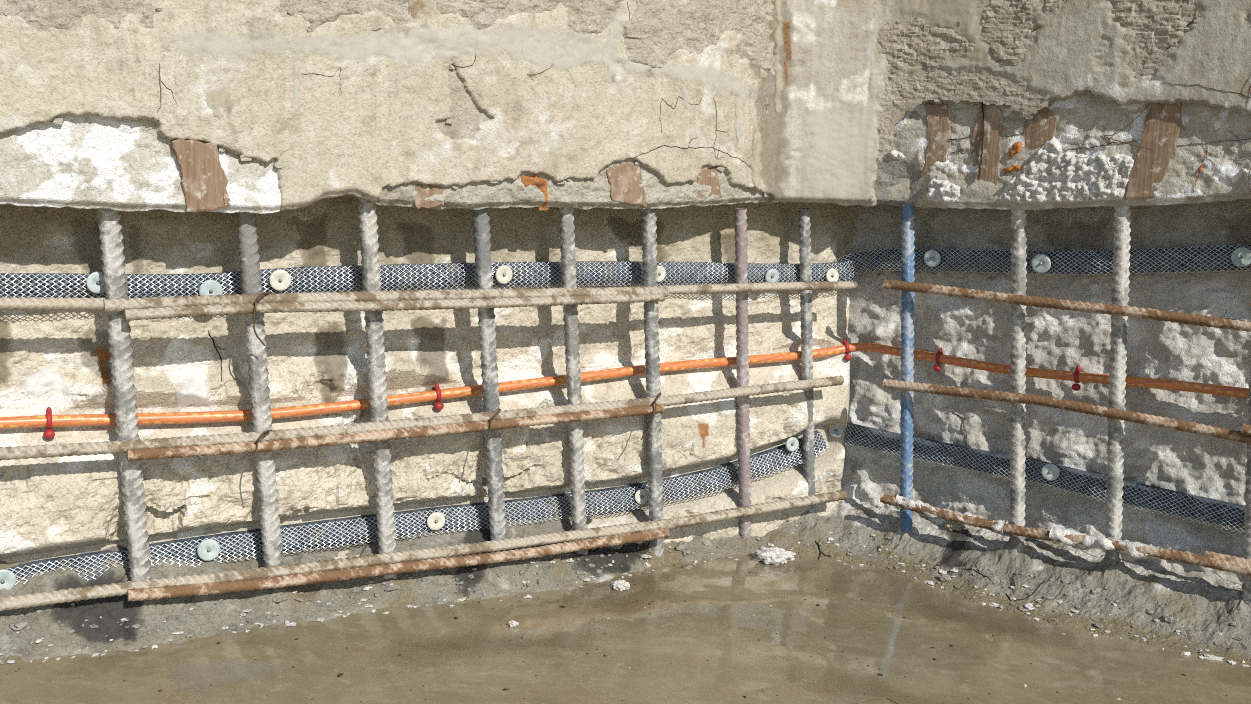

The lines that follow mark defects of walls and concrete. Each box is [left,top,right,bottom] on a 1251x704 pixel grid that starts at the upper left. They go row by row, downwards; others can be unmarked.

spalling [869,0,1251,210]
spalling [0,115,284,214]
corrosion [519,173,549,210]
spalling [371,158,770,210]
corrosion [96,348,111,385]
corrosion [699,424,709,447]